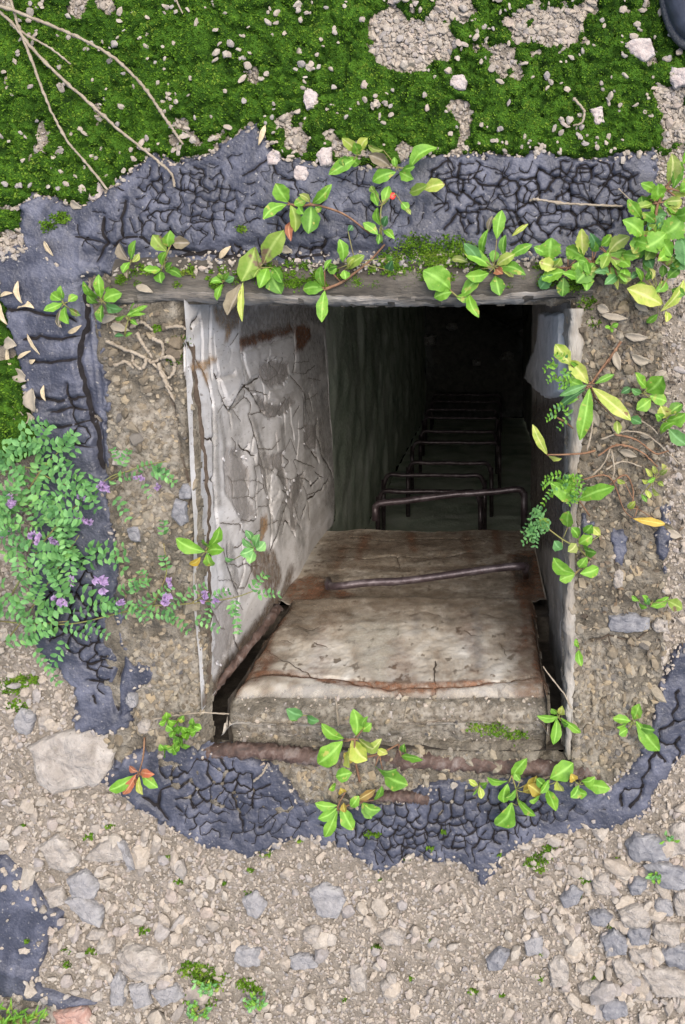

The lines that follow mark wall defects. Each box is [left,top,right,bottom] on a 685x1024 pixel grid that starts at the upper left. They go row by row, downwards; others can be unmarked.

crack [75,153,641,261]
crack [8,293,106,469]
rust [216,308,311,350]
crack [165,316,332,684]
rust [214,576,492,697]
crack [258,610,531,699]
rust [196,741,342,768]
crack [141,689,683,866]
rust [372,750,560,778]
rust [568,767,601,782]